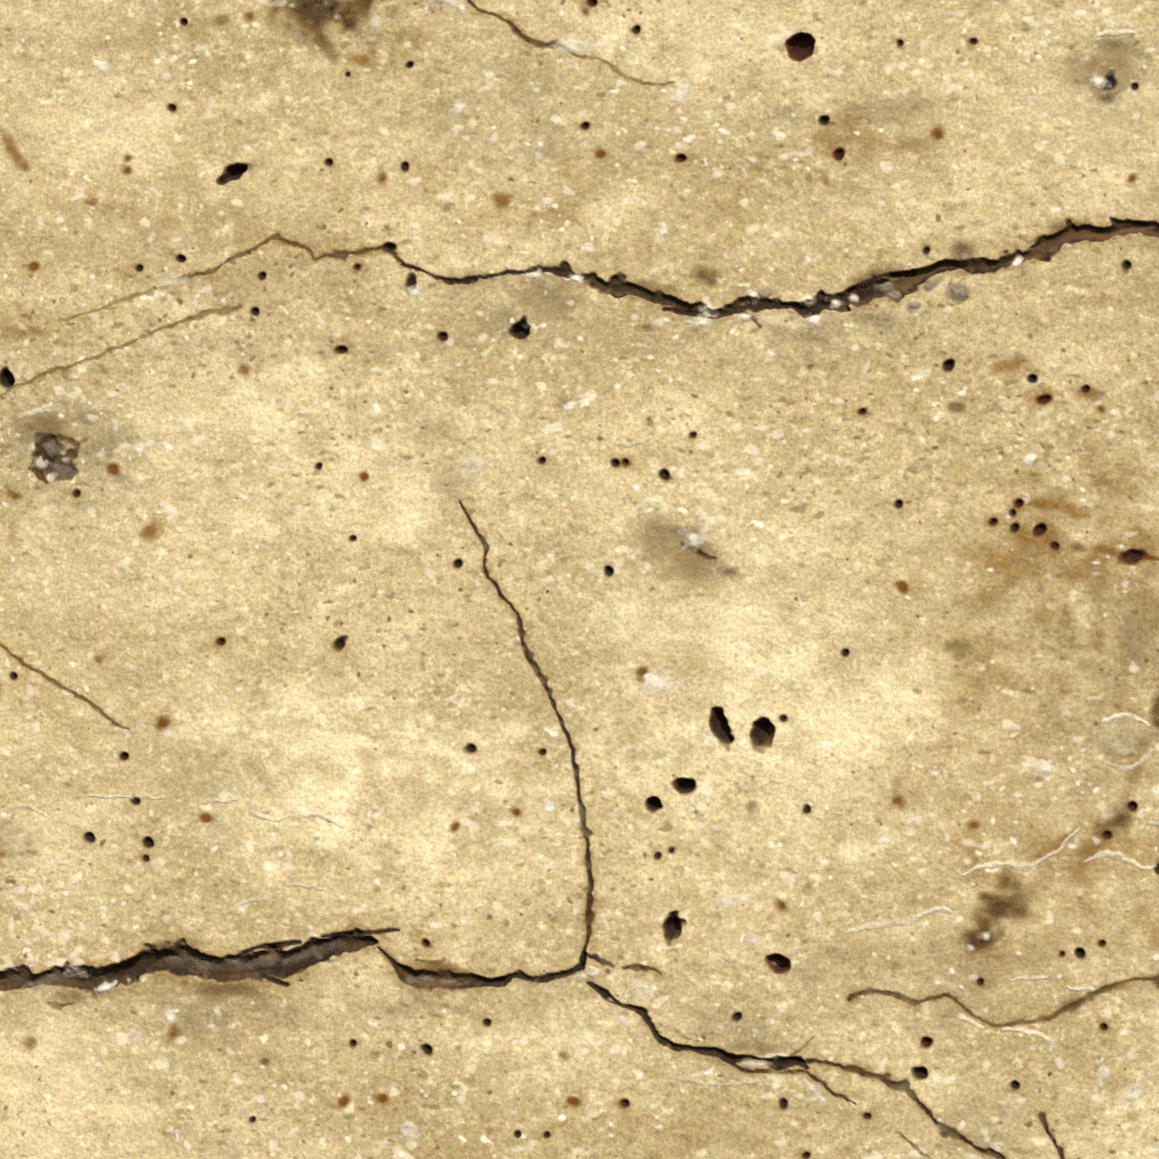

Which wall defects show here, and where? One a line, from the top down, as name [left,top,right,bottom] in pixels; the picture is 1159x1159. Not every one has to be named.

crack [442,0,675,85]
crack [63,292,141,321]
crack [178,219,1159,329]
crack [0,500,1005,1159]
crack [847,976,1159,1076]
crack [1039,1113,1064,1159]